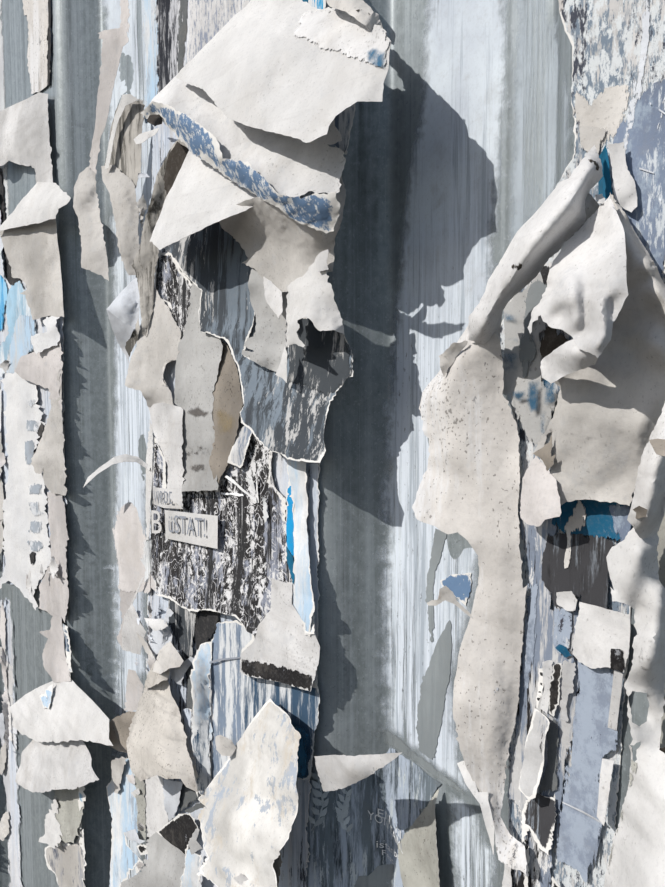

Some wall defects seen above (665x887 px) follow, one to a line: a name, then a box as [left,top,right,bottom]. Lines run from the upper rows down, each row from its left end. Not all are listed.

peeling [84,454,150,487]
peeling [416,528,452,760]